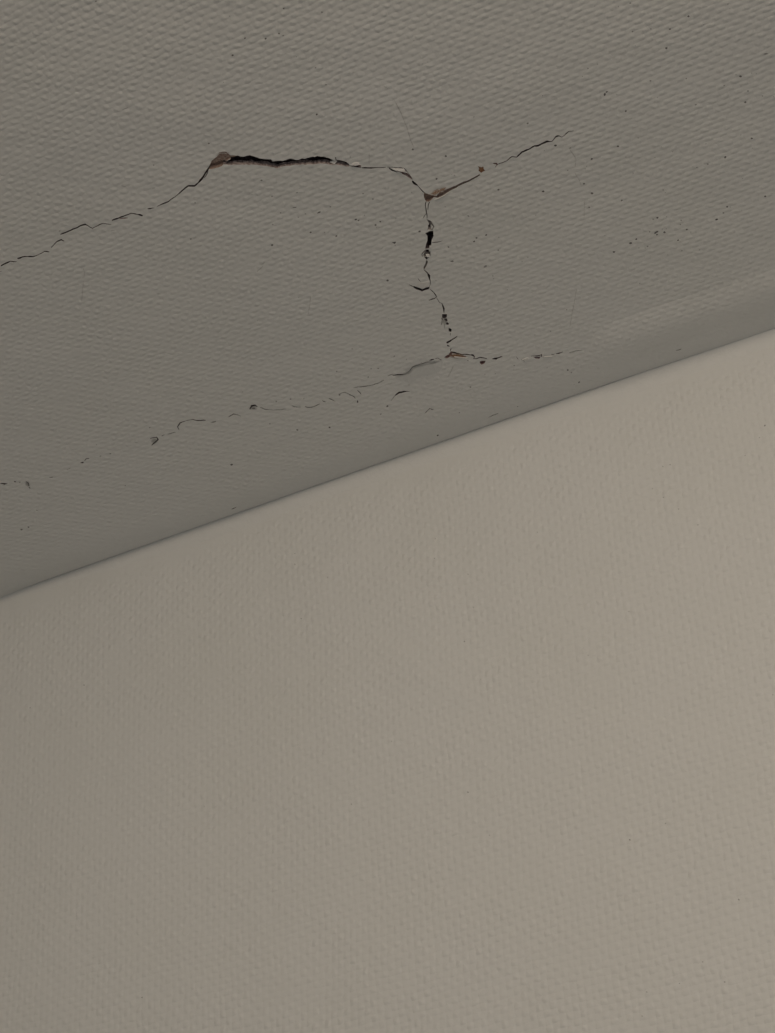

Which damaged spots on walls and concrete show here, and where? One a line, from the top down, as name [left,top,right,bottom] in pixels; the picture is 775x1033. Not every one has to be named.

crack [1,87,585,445]